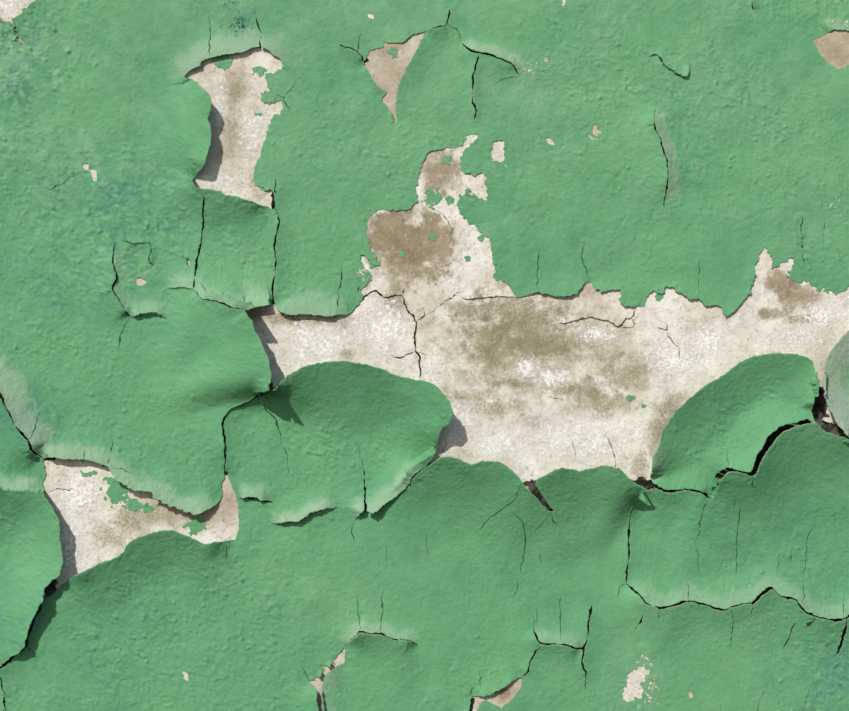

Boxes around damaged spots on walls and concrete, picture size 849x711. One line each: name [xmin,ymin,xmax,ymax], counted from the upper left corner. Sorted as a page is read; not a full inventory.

peeling [145,18,295,209]
peeling [363,32,424,123]
crack [424,11,519,122]
peeling [0,134,849,666]
crack [336,267,518,376]
water stain [441,299,662,474]
water stain [610,321,730,387]
crack [638,420,830,566]
crack [617,501,849,654]
peeling [291,632,529,711]
crack [523,597,592,689]
peeling [621,666,650,702]